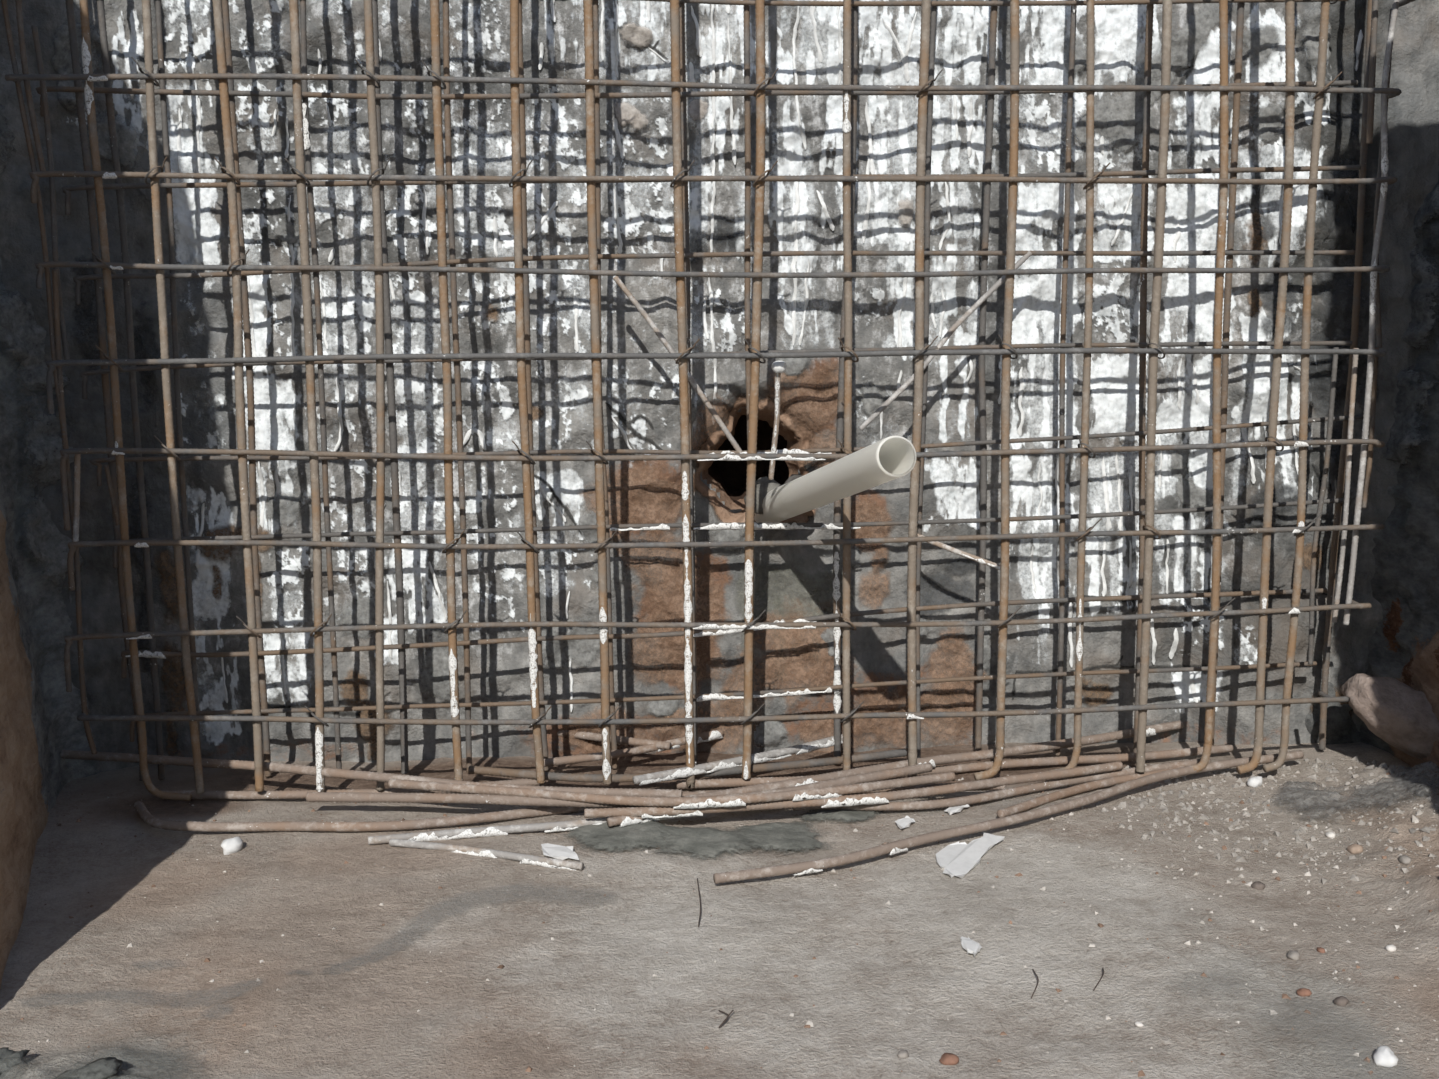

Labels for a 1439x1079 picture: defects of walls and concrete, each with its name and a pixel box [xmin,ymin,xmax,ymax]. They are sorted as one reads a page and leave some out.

leakage [112,10,149,156]
leakage [163,0,221,334]
leakage [180,385,225,417]
spalling [678,400,745,450]
leakage [231,0,1368,713]
leakage [1358,362,1378,419]
leakage [186,486,242,746]